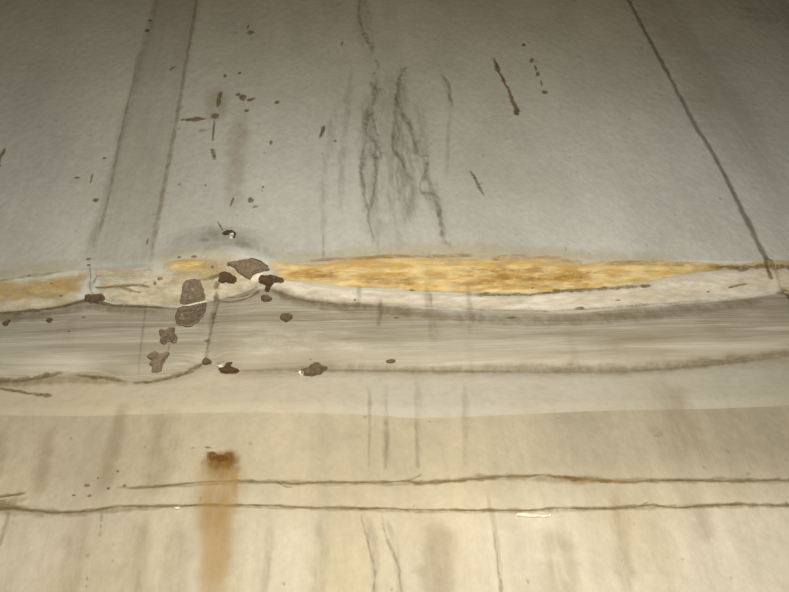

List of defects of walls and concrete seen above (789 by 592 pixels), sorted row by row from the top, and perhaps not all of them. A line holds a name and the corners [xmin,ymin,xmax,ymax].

corrosion [183,92,222,139]
peeling [0,258,789,418]
corrosion [206,446,234,471]
crack [514,508,558,518]